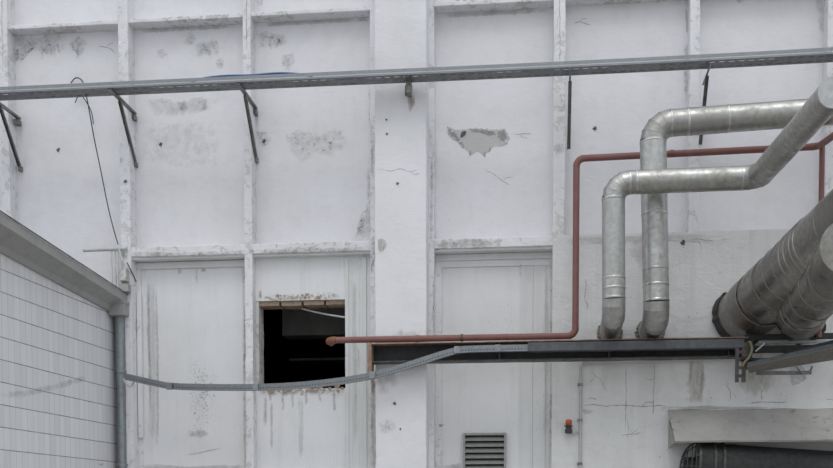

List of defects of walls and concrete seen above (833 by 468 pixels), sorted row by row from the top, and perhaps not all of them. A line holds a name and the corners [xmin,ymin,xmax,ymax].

spalling [447,127,510,157]
crack [591,373,661,439]